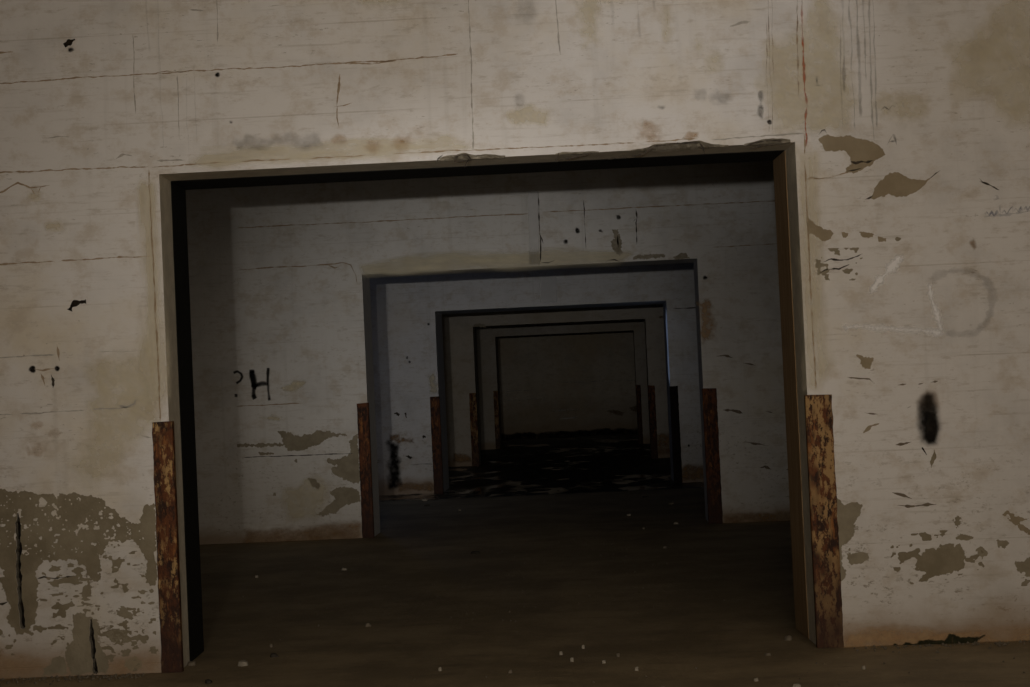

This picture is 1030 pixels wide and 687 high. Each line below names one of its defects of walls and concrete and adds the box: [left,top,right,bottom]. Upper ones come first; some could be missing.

peeling [818,134,885,174]
peeling [871,172,930,200]
peeling [806,217,901,281]
peeling [237,430,361,517]
peeling [0,489,158,676]
peeling [837,498,869,581]
peeling [890,516,1009,584]
peeling [1002,510,1030,535]
peeling [1015,557,1030,586]